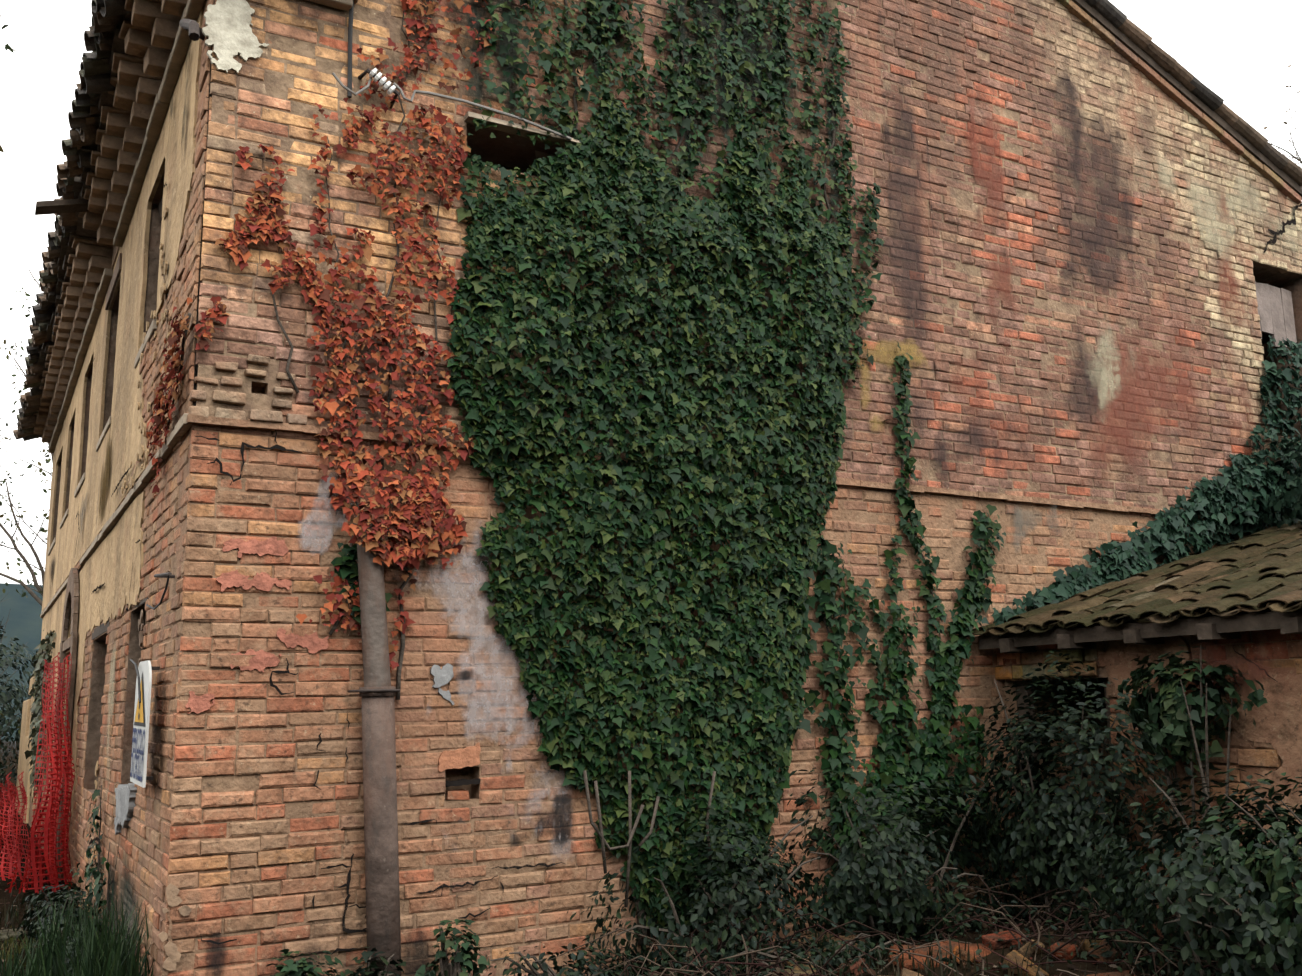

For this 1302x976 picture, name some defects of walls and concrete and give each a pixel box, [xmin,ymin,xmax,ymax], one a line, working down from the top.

peeling [202,0,269,74]
crack [1264,203,1302,253]
crack [111,464,132,497]
crack [195,430,303,486]
spalling [438,742,481,800]